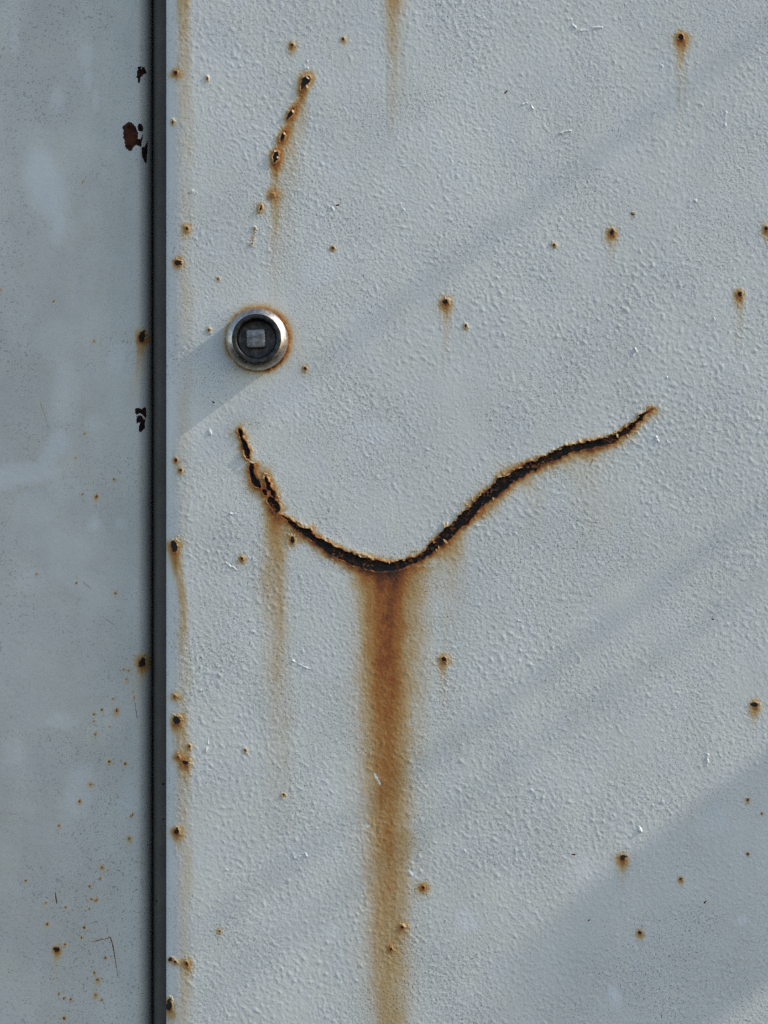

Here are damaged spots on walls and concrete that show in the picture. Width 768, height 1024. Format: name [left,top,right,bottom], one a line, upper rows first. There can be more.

corrosion [666,20,699,138]
peeling [122,122,148,163]
corrosion [601,220,625,273]
corrosion [431,289,471,370]
peeling [135,407,147,432]
corrosion [166,0,313,1024]
crack [223,391,669,577]
corrosion [89,647,152,743]
corrosion [743,695,766,739]
corrosion [332,526,471,1024]
corrosion [608,847,638,896]
corrosion [42,920,88,1024]